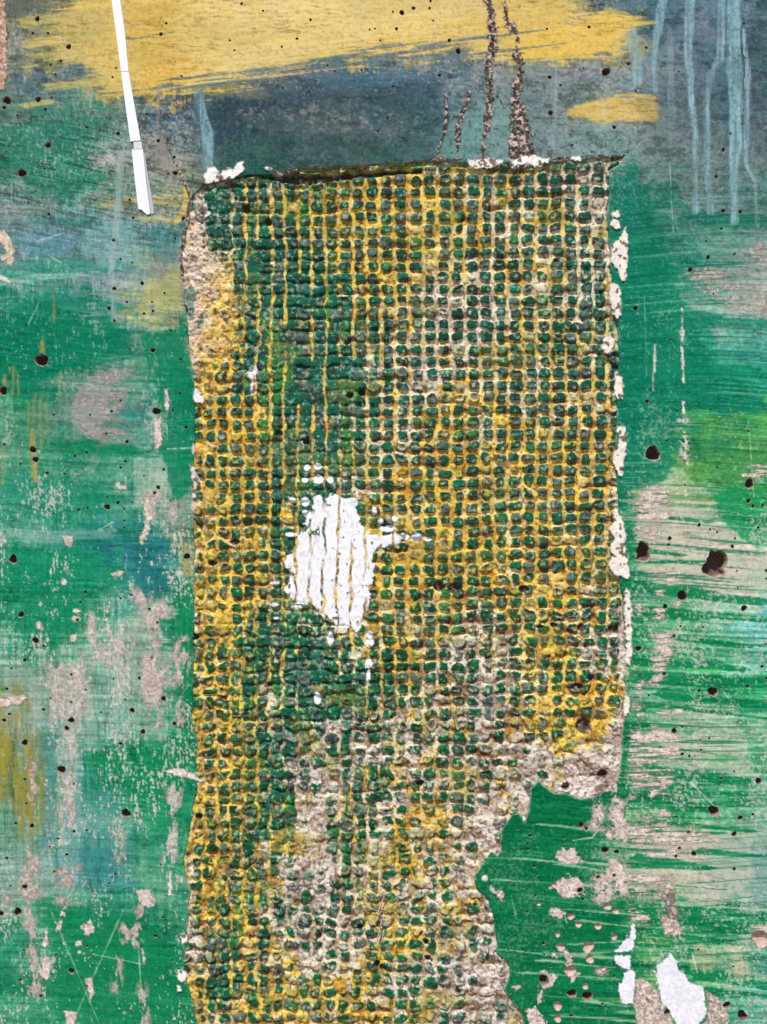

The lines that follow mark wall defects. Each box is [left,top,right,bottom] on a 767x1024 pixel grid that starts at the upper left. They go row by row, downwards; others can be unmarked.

spalling [45,155,729,1024]